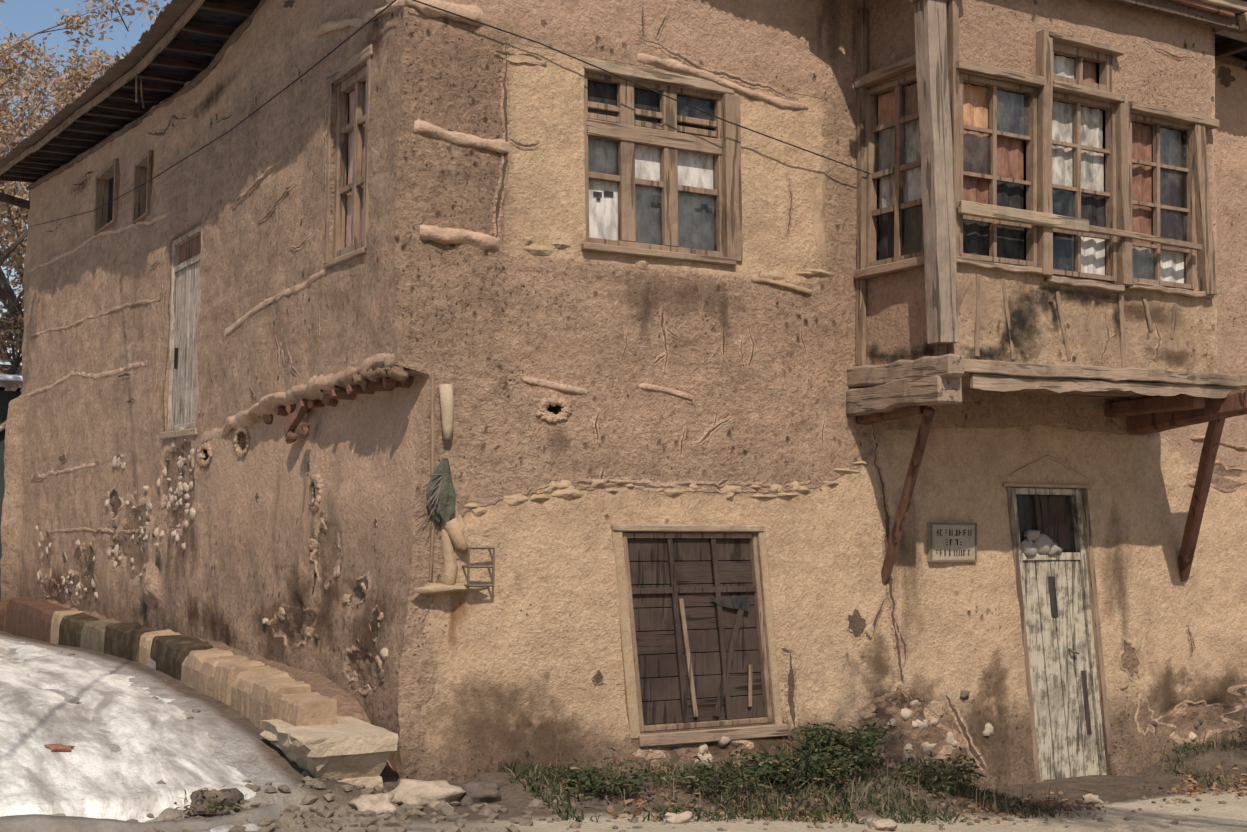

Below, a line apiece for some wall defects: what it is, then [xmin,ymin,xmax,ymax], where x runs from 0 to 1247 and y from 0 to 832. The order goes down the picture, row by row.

crack [145,110,234,138]
leakage [969,288,1109,360]
leakage [1084,305,1188,364]
crack [537,407,812,494]
spalling [35,426,212,608]
spalling [295,461,388,696]
spalling [262,603,319,652]
spalling [1118,635,1247,744]